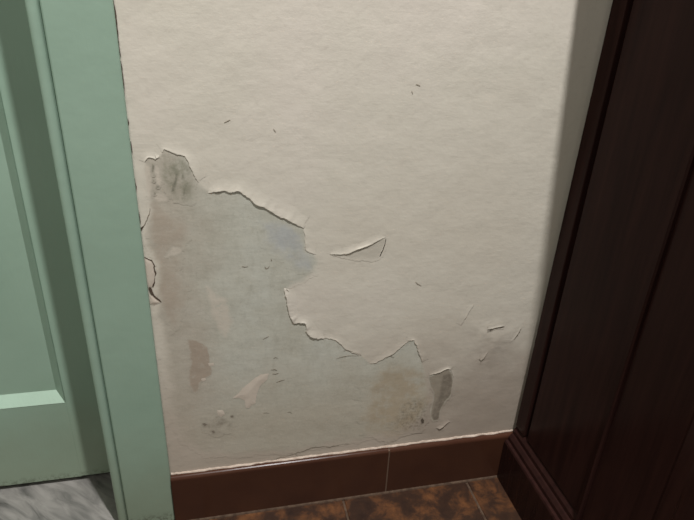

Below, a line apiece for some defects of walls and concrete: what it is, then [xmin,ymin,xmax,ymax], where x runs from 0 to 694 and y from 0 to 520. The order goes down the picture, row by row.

leakage [145,153,197,335]
peeling [139,142,458,459]
leakage [353,361,434,444]